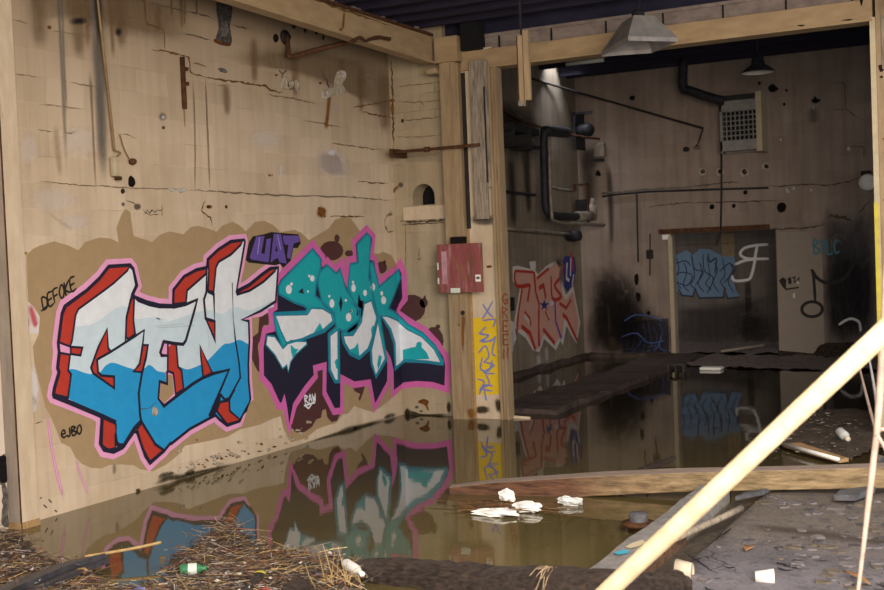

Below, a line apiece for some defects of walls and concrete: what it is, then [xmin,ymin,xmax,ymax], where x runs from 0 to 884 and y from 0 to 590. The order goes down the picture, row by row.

leakage [58,0,185,165]
crack [126,0,441,150]
leakage [253,48,370,103]